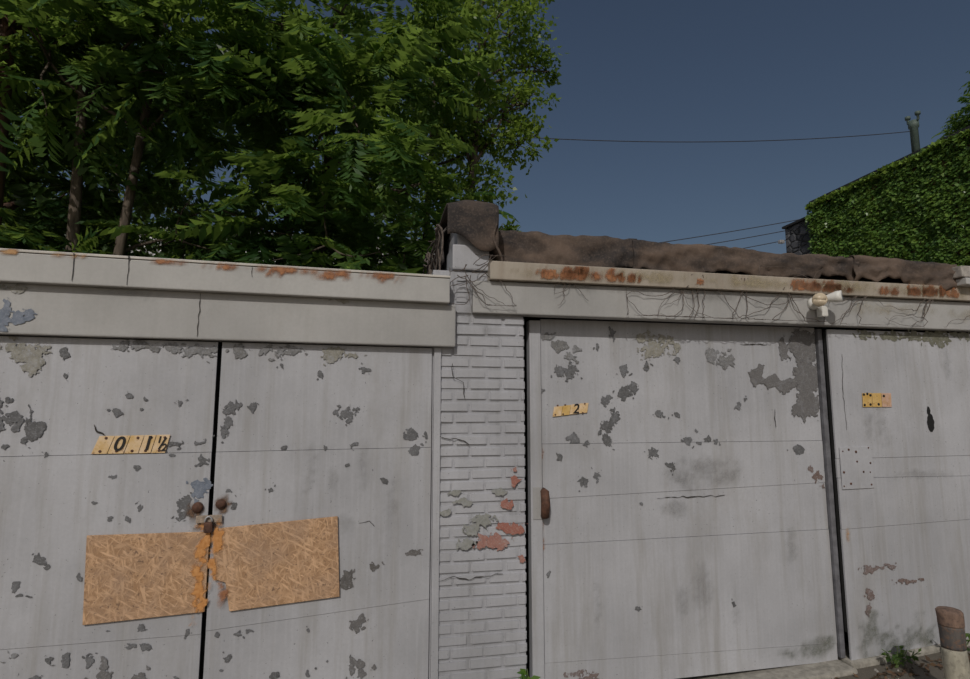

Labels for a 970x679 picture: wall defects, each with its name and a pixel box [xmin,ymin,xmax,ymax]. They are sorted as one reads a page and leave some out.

corrosion [259,266,348,279]
corrosion [536,266,641,283]
peeling [0,284,70,377]
peeling [705,348,735,370]
peeling [748,326,820,423]
peeling [0,397,46,450]
peeling [566,364,639,450]
peeling [439,467,529,551]
corrosion [187,497,231,613]
peeling [45,652,70,668]
peeling [82,653,113,679]
peeling [346,655,377,679]